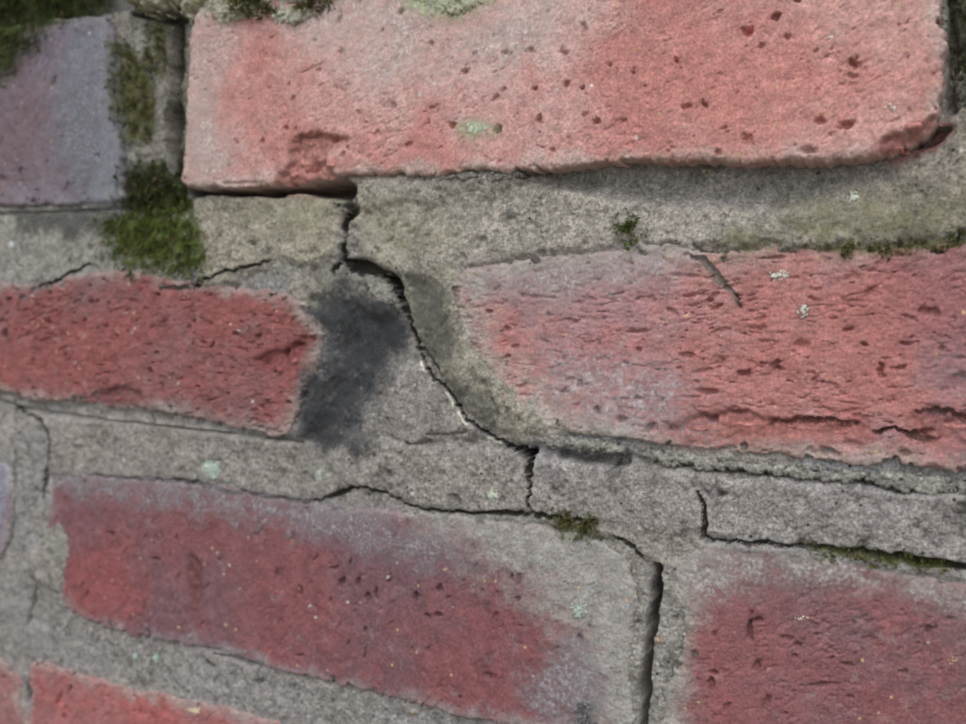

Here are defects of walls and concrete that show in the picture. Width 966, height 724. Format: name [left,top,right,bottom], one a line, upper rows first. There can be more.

leakage [300,275,451,457]
crack [617,537,643,557]